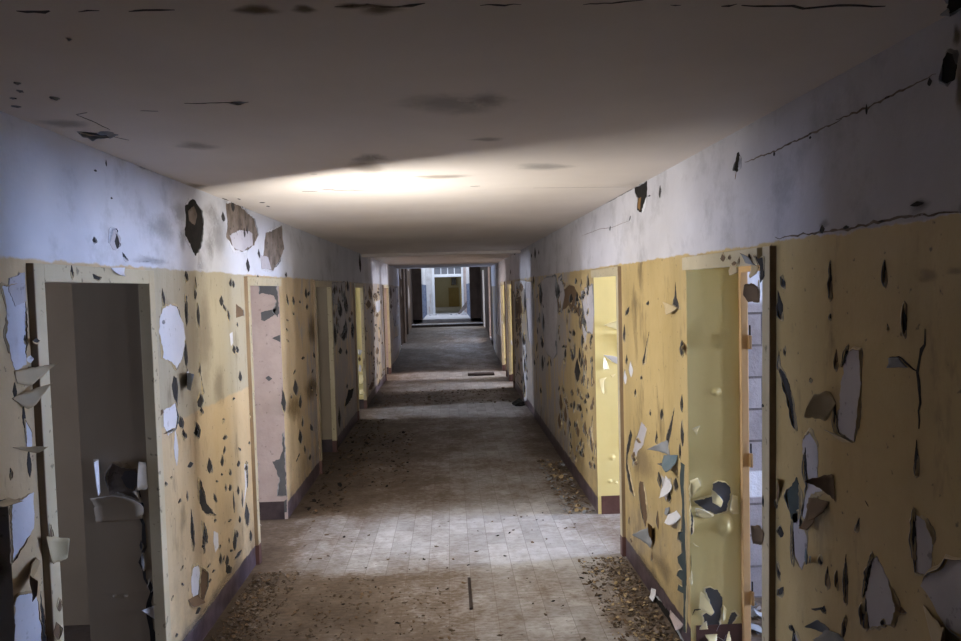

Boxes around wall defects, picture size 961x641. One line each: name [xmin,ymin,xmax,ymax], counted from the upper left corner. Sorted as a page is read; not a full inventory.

crack [17,8,50,16]
crack [129,6,173,14]
crack [335,1,425,9]
crack [721,3,885,11]
crack [747,74,934,162]
spalling [184,198,204,256]
spalling [221,198,310,342]
crack [775,201,961,239]
peeling [159,271,261,615]
peeling [626,396,740,641]
peeling [762,344,907,641]
peeling [14,523,70,641]